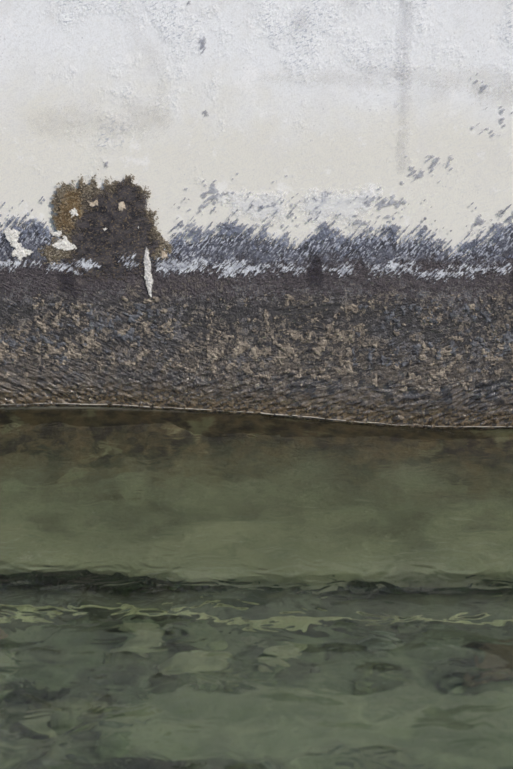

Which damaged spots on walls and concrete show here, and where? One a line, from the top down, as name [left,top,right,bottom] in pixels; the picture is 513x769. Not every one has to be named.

peeling [4,228,33,261]
peeling [0,247,513,392]